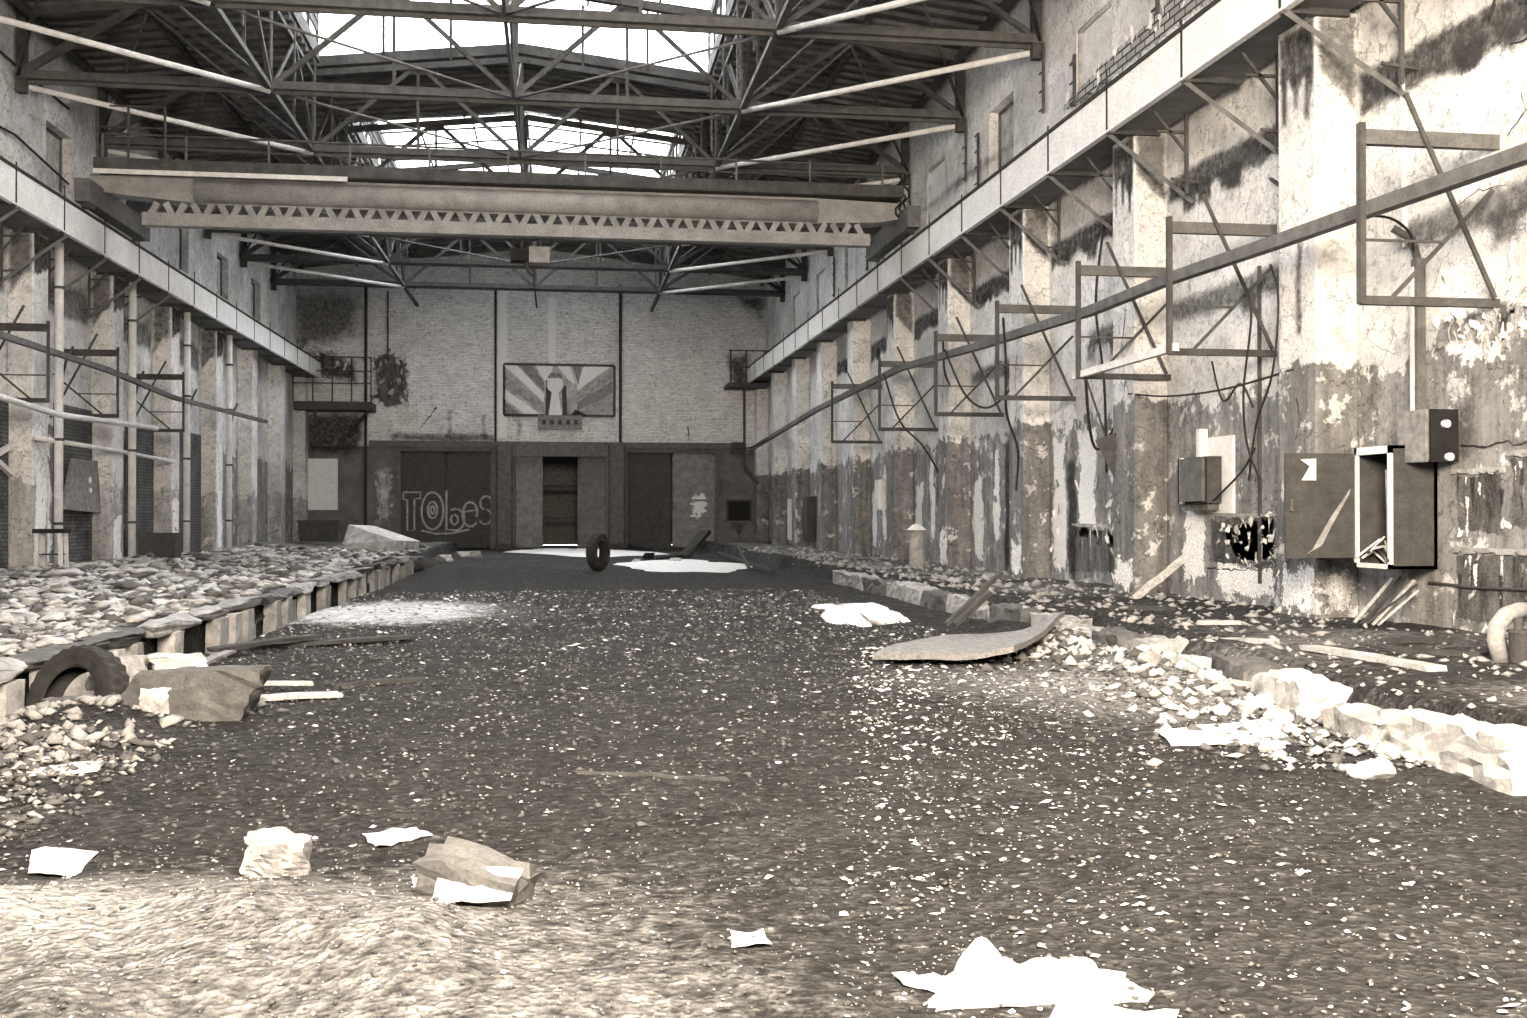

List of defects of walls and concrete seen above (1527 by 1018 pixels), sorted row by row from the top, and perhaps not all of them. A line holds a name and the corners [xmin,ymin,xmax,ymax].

spalling [1064,0,1211,110]
water stain [871,0,1527,362]
peeling [871,464,887,548]
peeling [915,459,948,565]
peeling [972,446,1023,575]
peeling [1049,424,1134,593]
spalling [1450,448,1527,626]